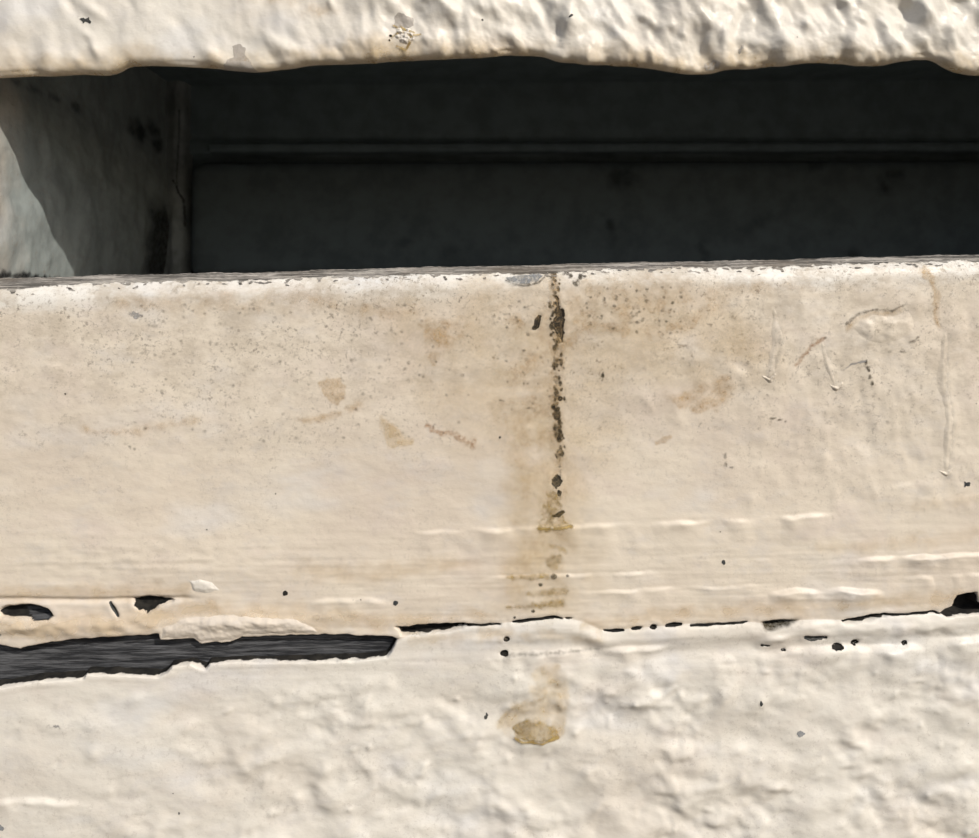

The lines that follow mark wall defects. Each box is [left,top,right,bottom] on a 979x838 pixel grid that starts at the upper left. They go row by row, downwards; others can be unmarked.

peeling [389,13,421,50]
water stain [146,210,169,274]
crack [549,273,582,517]
water stain [537,494,573,532]
crack [842,592,979,621]
crack [604,619,796,632]
water stain [513,720,559,745]